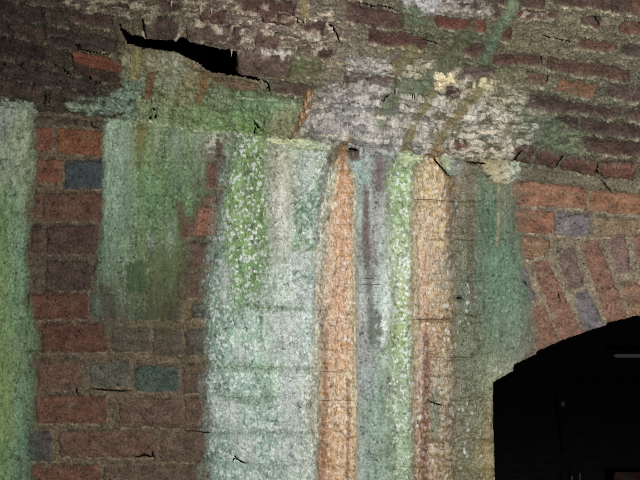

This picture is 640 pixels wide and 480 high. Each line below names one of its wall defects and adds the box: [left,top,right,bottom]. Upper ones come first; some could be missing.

peeling [345,55,400,79]
peeling [432,72,457,91]
peeling [473,78,499,90]
peeling [400,93,436,106]
peeling [350,112,429,128]
peeling [320,134,403,145]
damp [93,118,328,480]